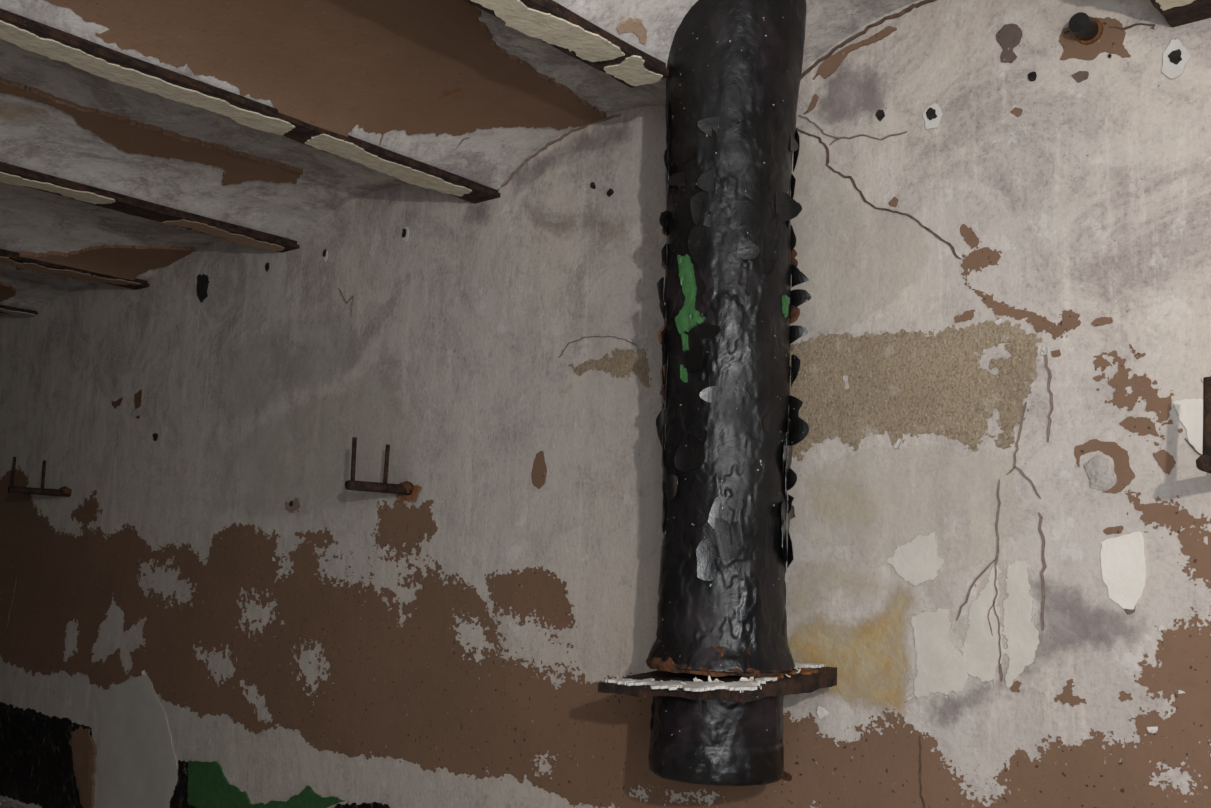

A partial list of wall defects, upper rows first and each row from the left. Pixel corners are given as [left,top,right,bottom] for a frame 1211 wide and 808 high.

peeling [0,0,663,196]
crack [801,0,937,79]
peeling [0,172,116,204]
crack [796,115,961,259]
peeling [0,245,195,285]
spalling [568,211,708,532]
spalling [775,129,1113,568]
peeling [1093,344,1183,475]
crack [956,350,1054,681]
peeling [0,439,1211,808]
damp [789,589,908,708]
crack [918,735,926,808]